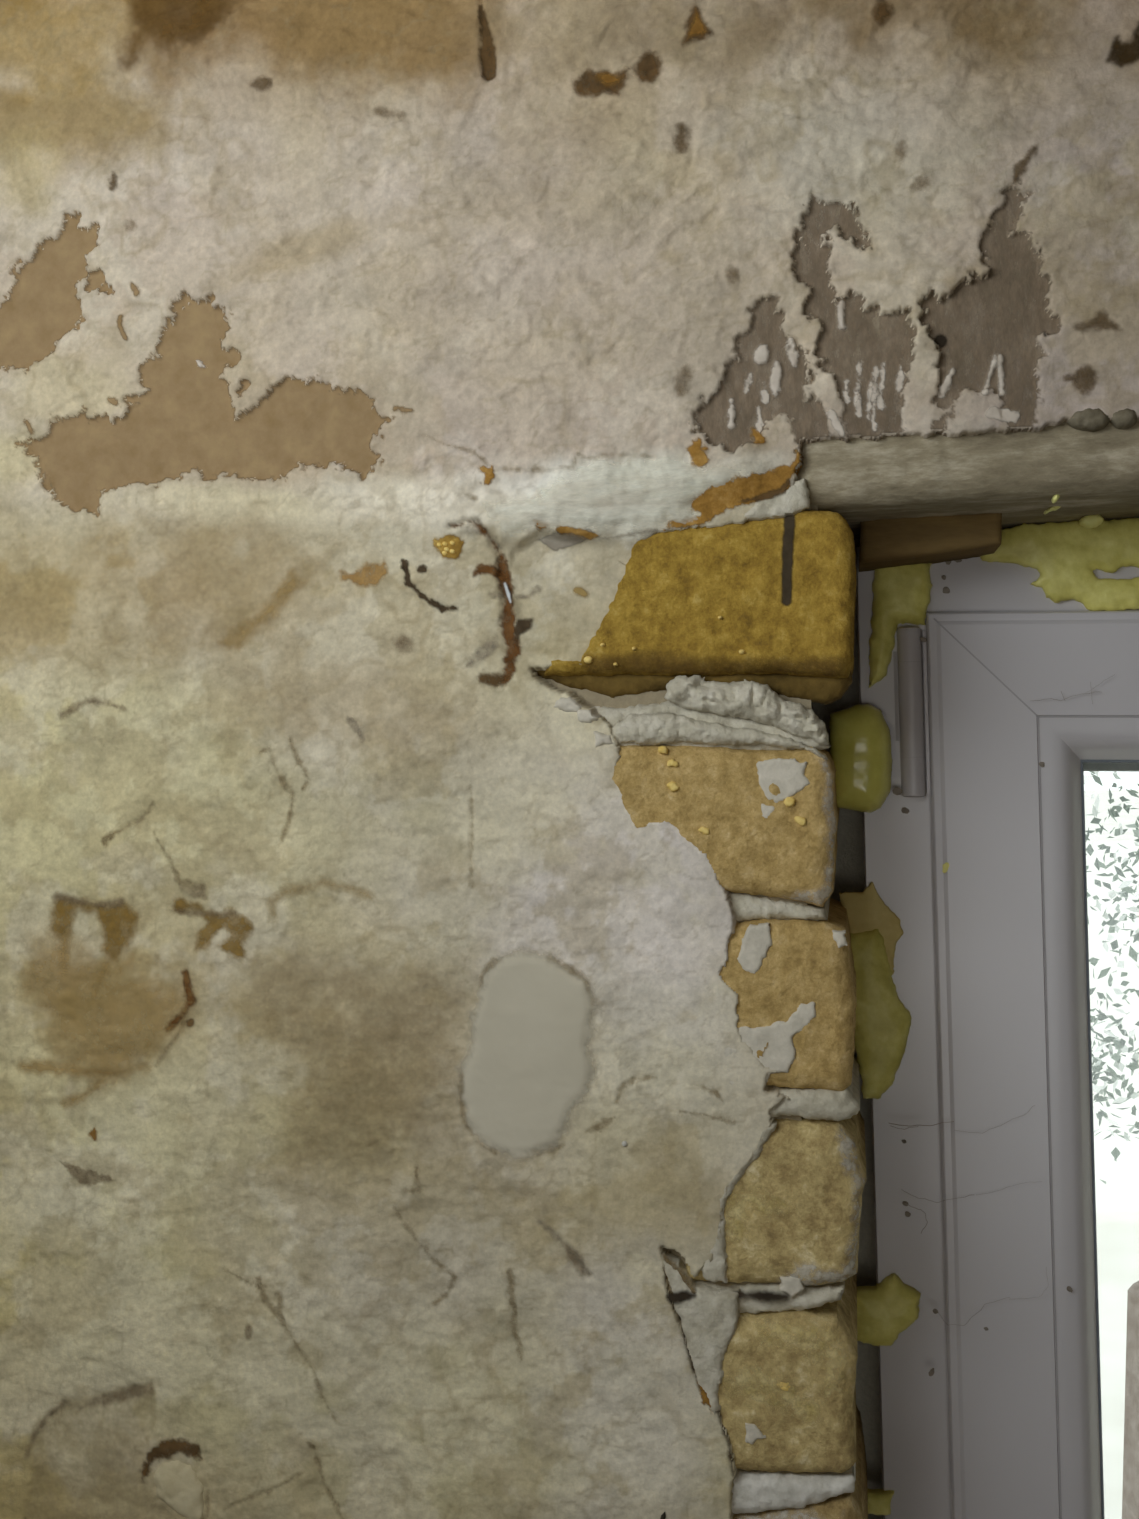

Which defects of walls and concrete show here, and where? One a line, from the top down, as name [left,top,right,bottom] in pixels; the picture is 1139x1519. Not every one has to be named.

peeling [0,211,139,374]
peeling [15,291,413,517]
peeling [628,147,1118,535]
spalling [533,519,599,551]
water stain [22,949,184,1088]
spalling [662,1254,696,1303]
crack [664,1253,734,1472]
flaking render [697,1381,711,1408]